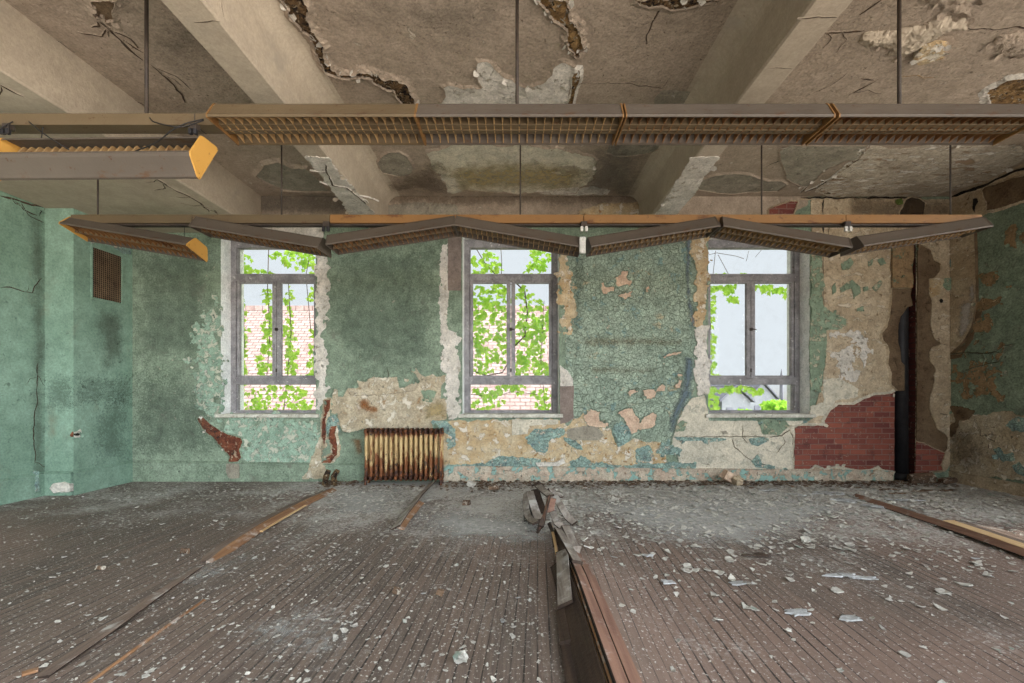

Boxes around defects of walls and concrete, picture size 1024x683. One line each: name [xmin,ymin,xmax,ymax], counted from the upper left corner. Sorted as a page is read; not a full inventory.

crack [56,13,191,103]
spalling [277,0,420,104]
peeling [438,0,590,104]
crack [796,0,882,95]
spalling [910,40,952,66]
crack [967,24,1024,32]
leakage [456,166,579,189]
peeling [811,228,908,239]
peeling [183,233,1024,481]
crack [565,241,794,465]
crack [25,363,45,468]